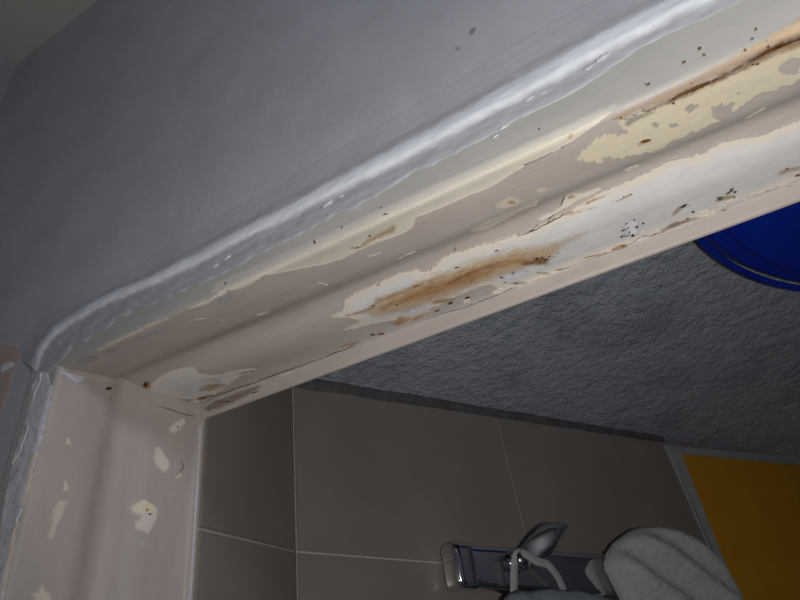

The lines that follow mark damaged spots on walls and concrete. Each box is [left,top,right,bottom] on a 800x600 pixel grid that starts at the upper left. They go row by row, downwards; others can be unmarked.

corrosion [643,22,800,110]
peeling [189,40,800,336]
corrosion [348,243,560,325]
peeling [146,366,259,404]
crack [205,345,355,417]
peeling [153,407,193,479]
peeling [129,499,158,534]